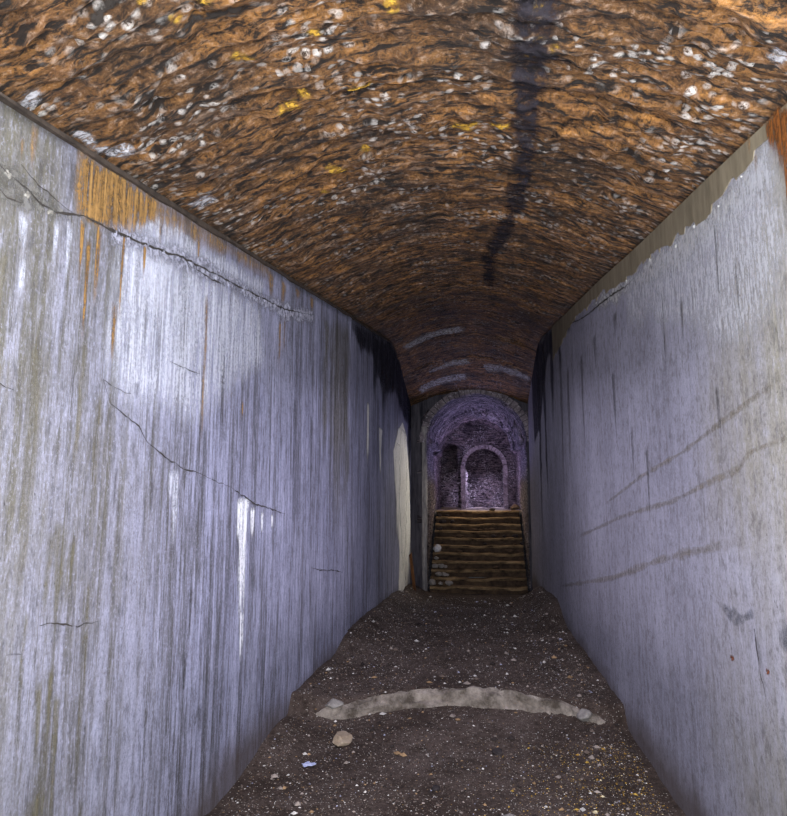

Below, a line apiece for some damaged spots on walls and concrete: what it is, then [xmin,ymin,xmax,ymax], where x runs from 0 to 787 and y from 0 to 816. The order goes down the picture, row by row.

damp [480,0,570,285]
rust [766,109,787,195]
rust [75,155,227,349]
crack [0,164,312,316]
damp [116,244,262,420]
damp [136,220,263,291]
crack [103,380,284,514]
damp [324,323,469,590]
damp [237,499,273,655]
damp [36,676,58,750]